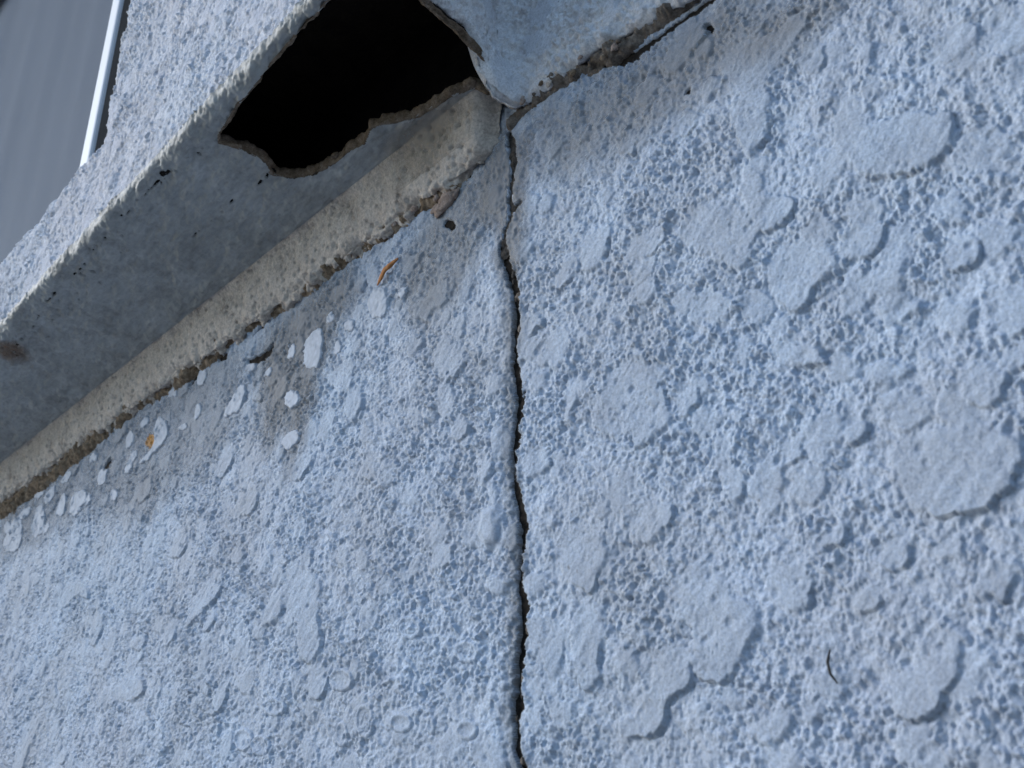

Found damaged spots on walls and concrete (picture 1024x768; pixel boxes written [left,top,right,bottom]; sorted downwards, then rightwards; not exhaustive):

hole [217,0,490,179]
crack [620,0,716,66]
crack [500,133,530,768]